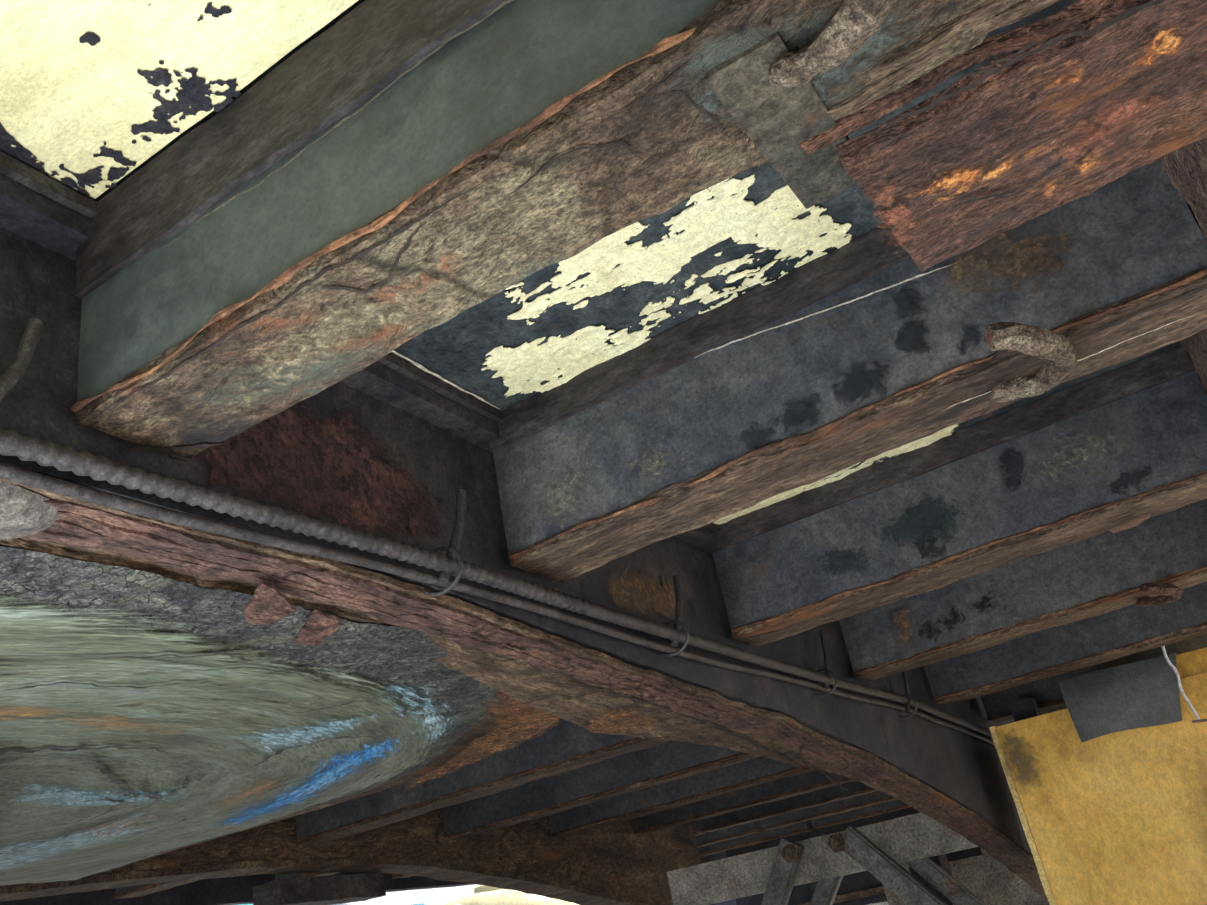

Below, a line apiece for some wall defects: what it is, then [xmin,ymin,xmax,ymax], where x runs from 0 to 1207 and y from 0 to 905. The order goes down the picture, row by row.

peeling [197,3,232,21]
rust [1136,31,1179,65]
peeling [0,61,241,196]
rust [1060,97,1158,170]
rust [919,162,1011,194]
peeling [481,174,852,397]
water stain [892,283,932,353]
water stain [832,362,888,406]
water stain [740,394,819,449]
rust [196,403,442,543]
peeling [713,424,958,525]
water stain [882,494,964,559]